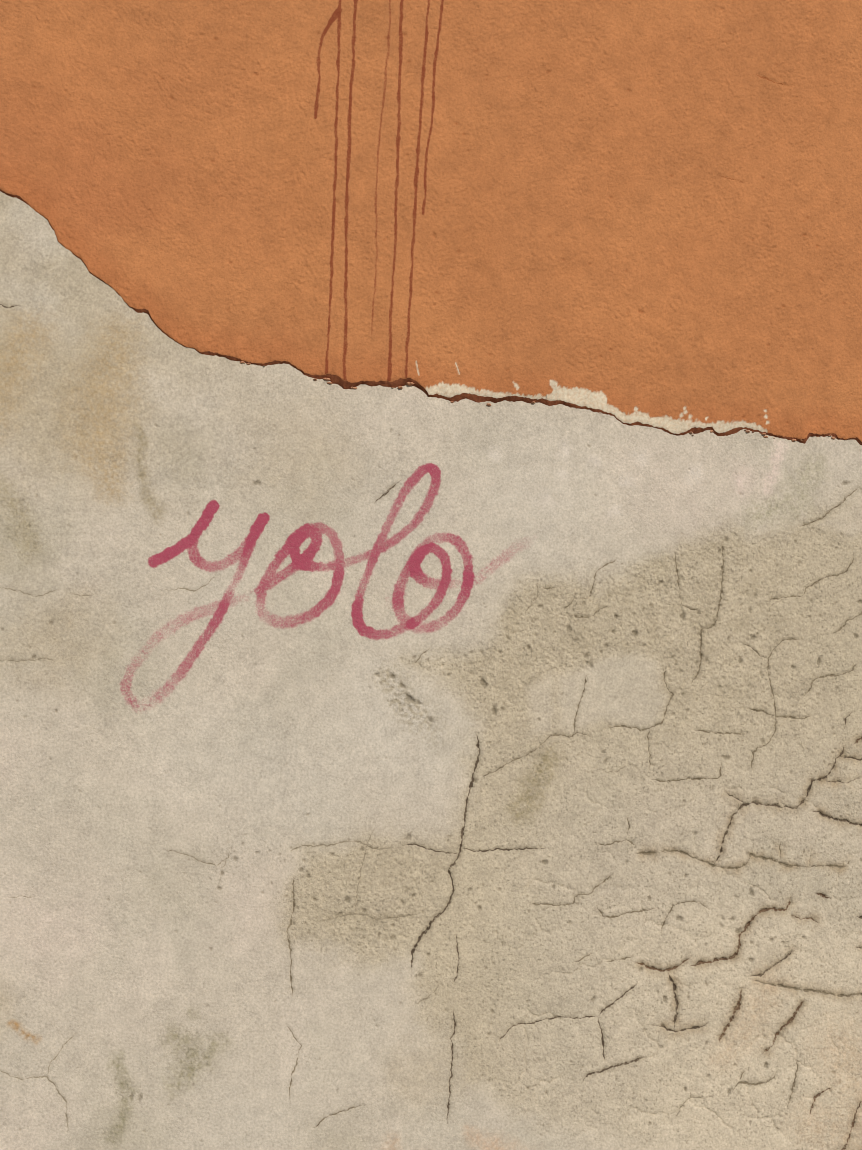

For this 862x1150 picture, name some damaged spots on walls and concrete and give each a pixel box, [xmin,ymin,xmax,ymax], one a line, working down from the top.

flaking render [0,189,172,359]
crack [802,489,857,526]
flaking render [0,322,862,1150]
crack [286,546,862,1124]
crack [842,1102,861,1150]